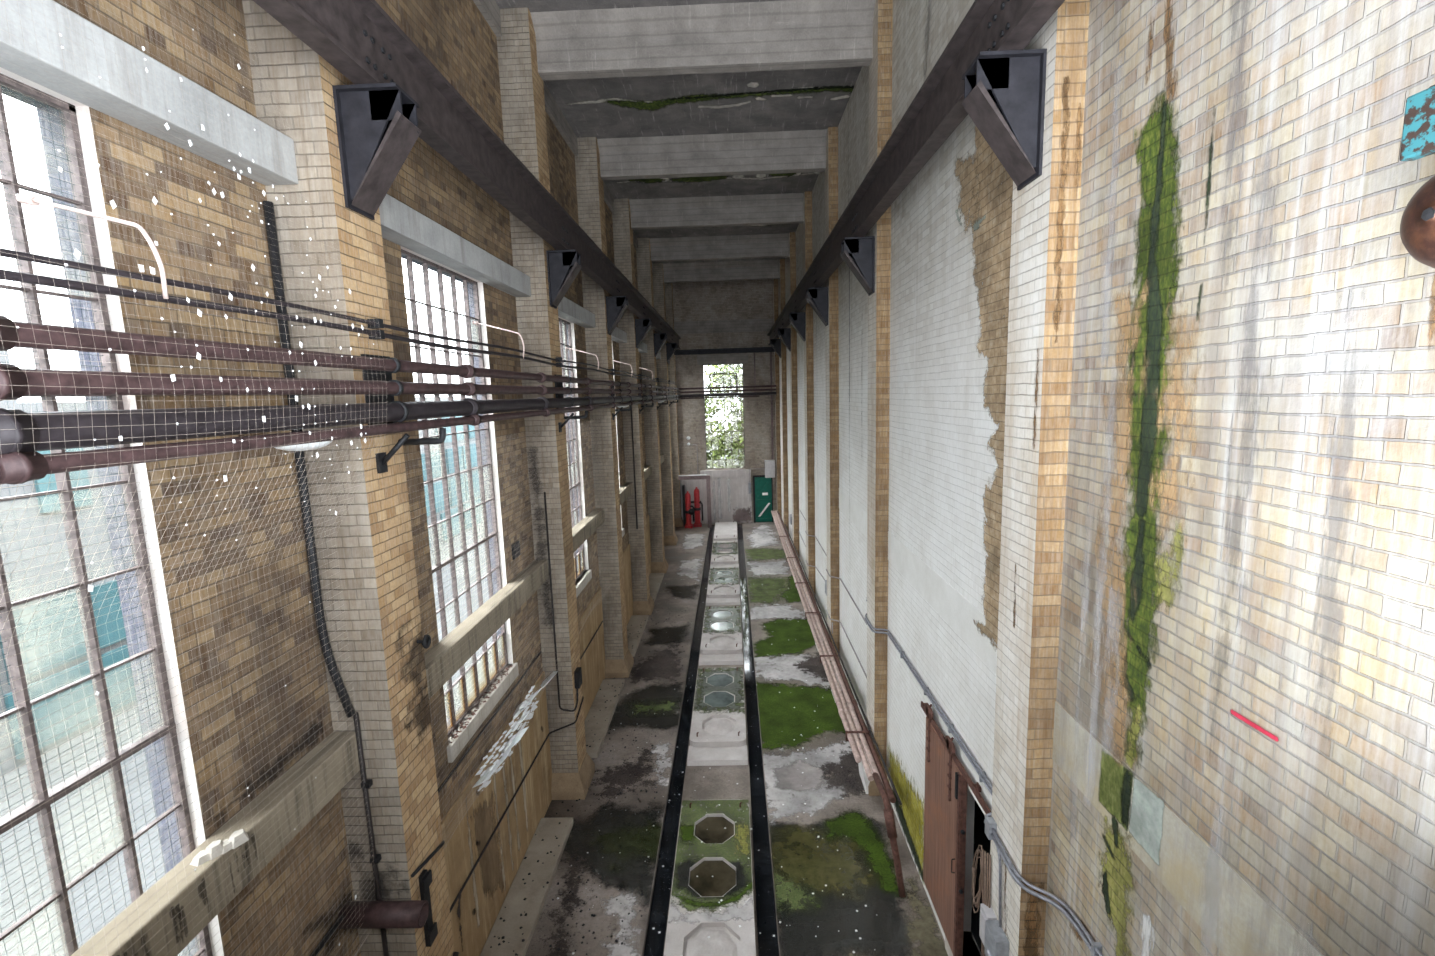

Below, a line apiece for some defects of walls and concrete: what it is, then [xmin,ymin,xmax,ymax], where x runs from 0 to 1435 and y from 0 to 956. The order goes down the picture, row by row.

peeling [955,127,1013,648]
damp [1119,101,1167,702]
damp [1204,128,1213,243]
damp [1129,779,1164,865]